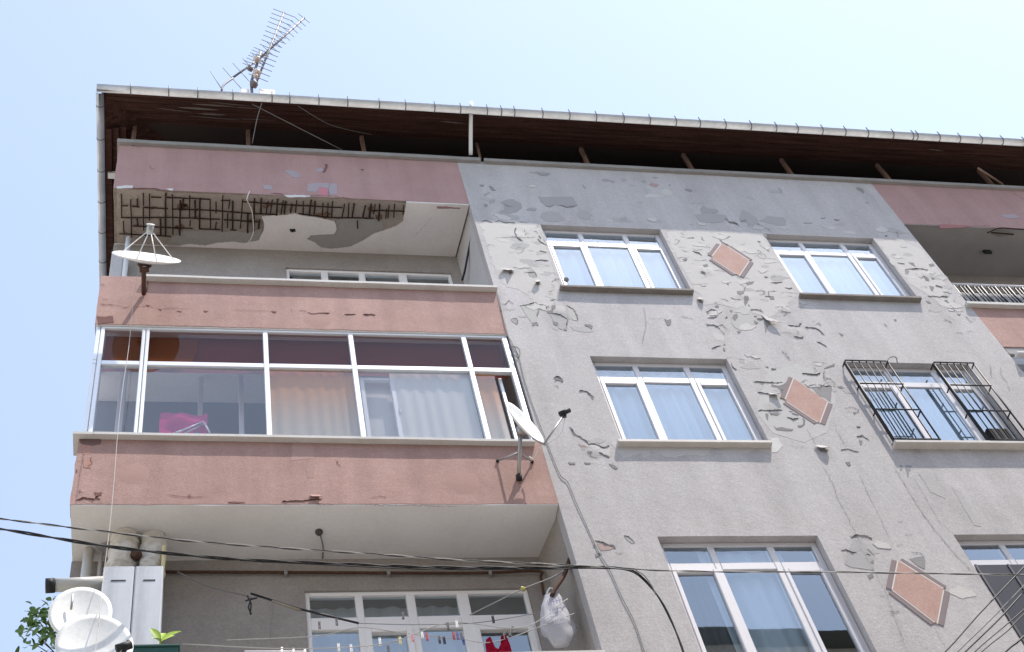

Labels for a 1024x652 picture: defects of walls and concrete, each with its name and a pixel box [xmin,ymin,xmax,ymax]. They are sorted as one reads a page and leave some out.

spalling [116,164,406,249]
peeling [480,185,593,331]
peeling [666,219,796,351]
peeling [877,235,961,316]
peeling [756,364,844,452]
peeling [845,533,875,579]